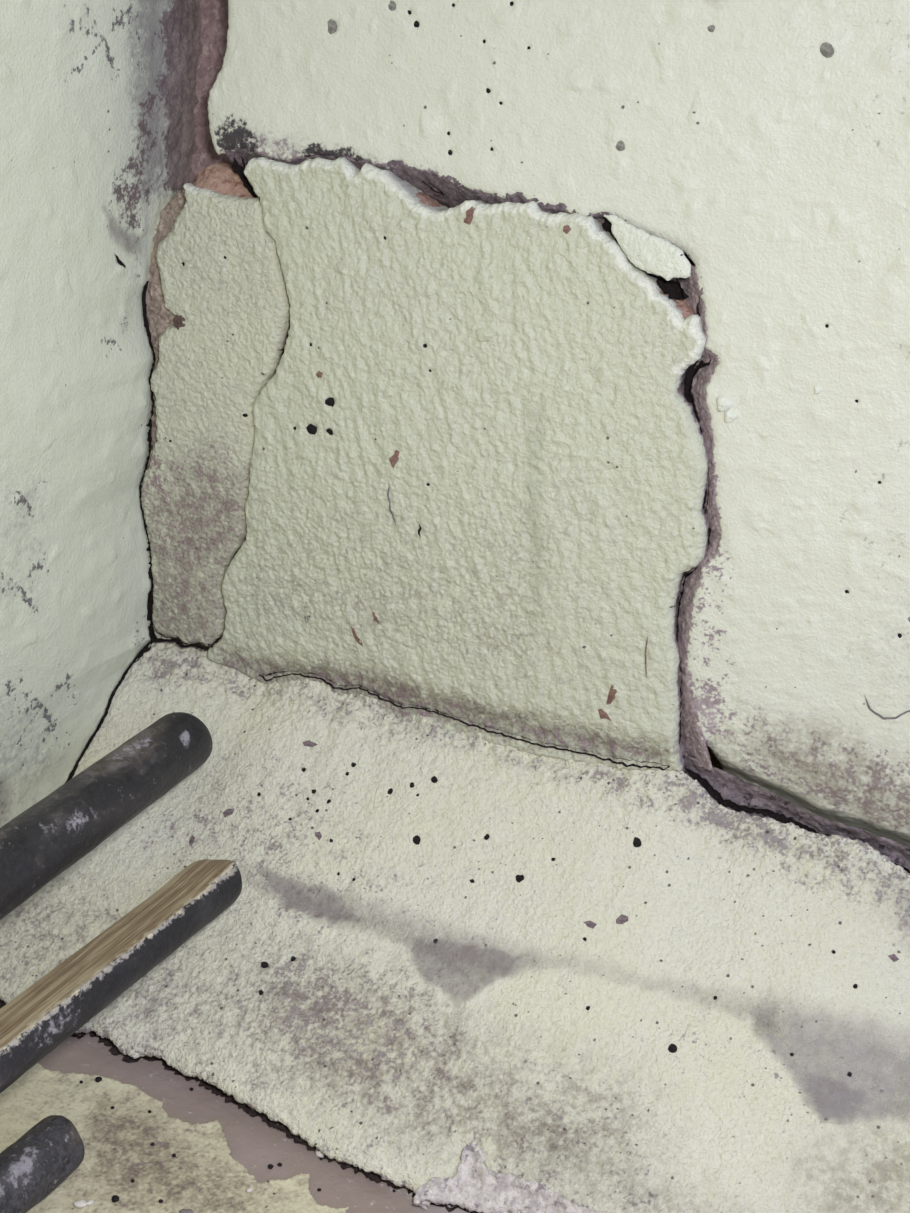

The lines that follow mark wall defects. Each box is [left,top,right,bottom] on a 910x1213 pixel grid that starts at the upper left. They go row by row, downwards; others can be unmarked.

flaking render [146,0,722,770]
crack [685,355,711,433]
crack [258,462,910,874]
peeling [0,1063,349,1213]
spalling [412,1141,607,1213]